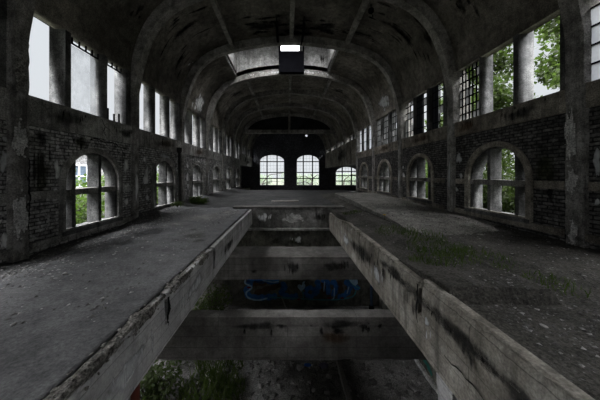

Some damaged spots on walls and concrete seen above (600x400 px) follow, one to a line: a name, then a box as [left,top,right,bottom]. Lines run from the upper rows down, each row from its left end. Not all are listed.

spalling [12,118,28,158]
spalling [564,107,578,194]
spalling [43,248,211,400]
crack [165,296,173,326]
leakage [344,236,530,400]
crack [444,355,484,400]